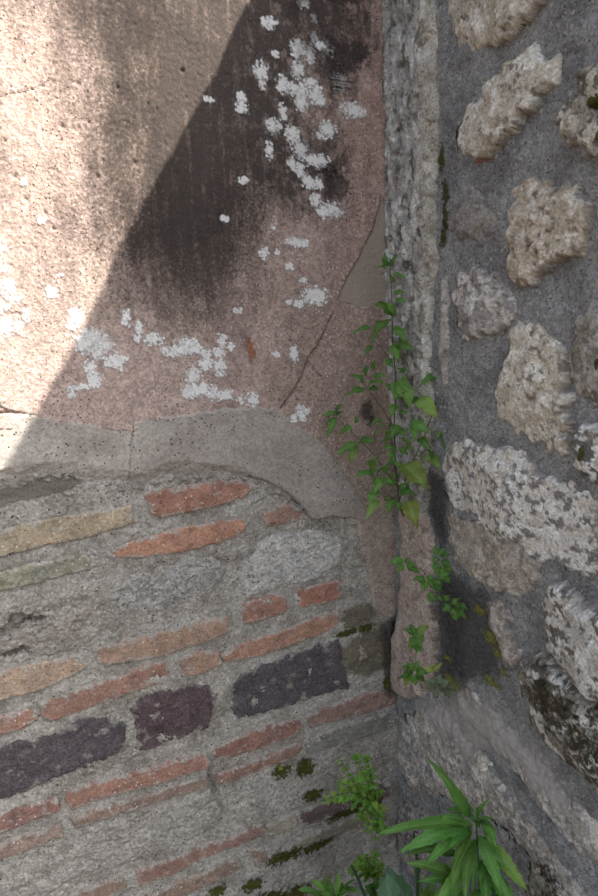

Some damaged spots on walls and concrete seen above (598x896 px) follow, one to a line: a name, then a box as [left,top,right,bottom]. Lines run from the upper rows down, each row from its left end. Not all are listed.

water stain [51,0,377,317]
water stain [65,307,130,399]
water stain [121,297,259,408]
water stain [271,345,299,364]
water stain [290,404,311,423]